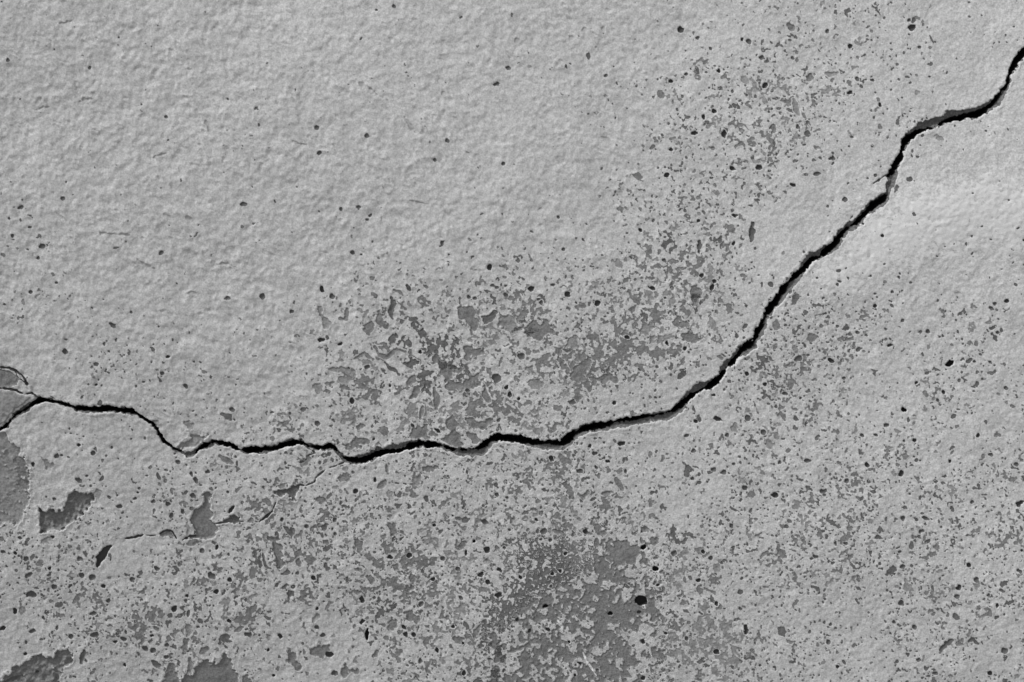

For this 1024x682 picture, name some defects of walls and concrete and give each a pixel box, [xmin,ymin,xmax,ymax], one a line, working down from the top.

crack [0,47,1024,541]